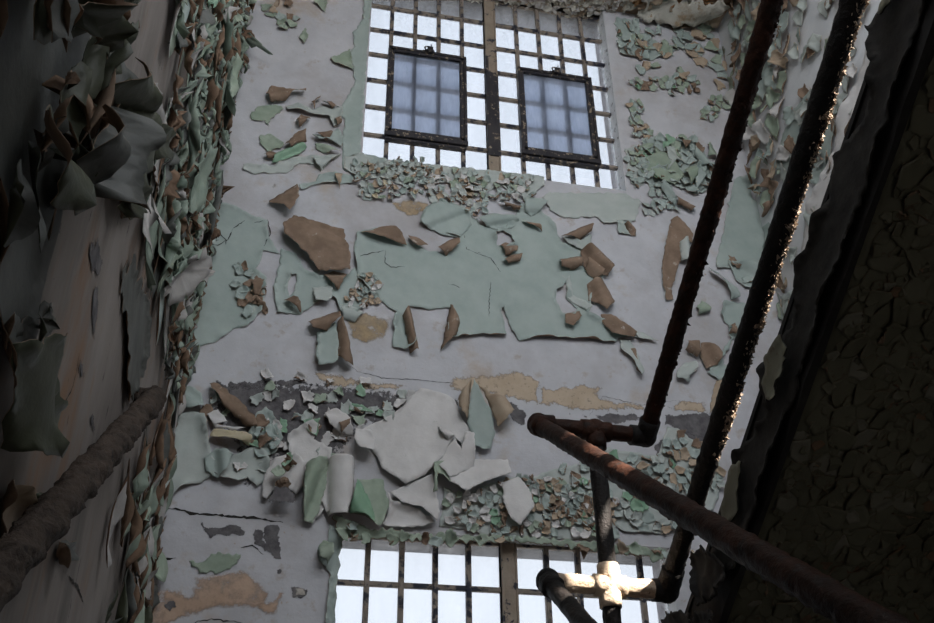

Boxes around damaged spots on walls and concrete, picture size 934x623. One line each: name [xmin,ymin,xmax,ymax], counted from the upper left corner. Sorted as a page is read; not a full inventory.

crack [168,508,281,522]
peeling [0,0,717,623]
peeling [492,0,761,122]
peeling [605,0,835,496]
peeling [661,544,834,623]
peeling [704,0,934,623]